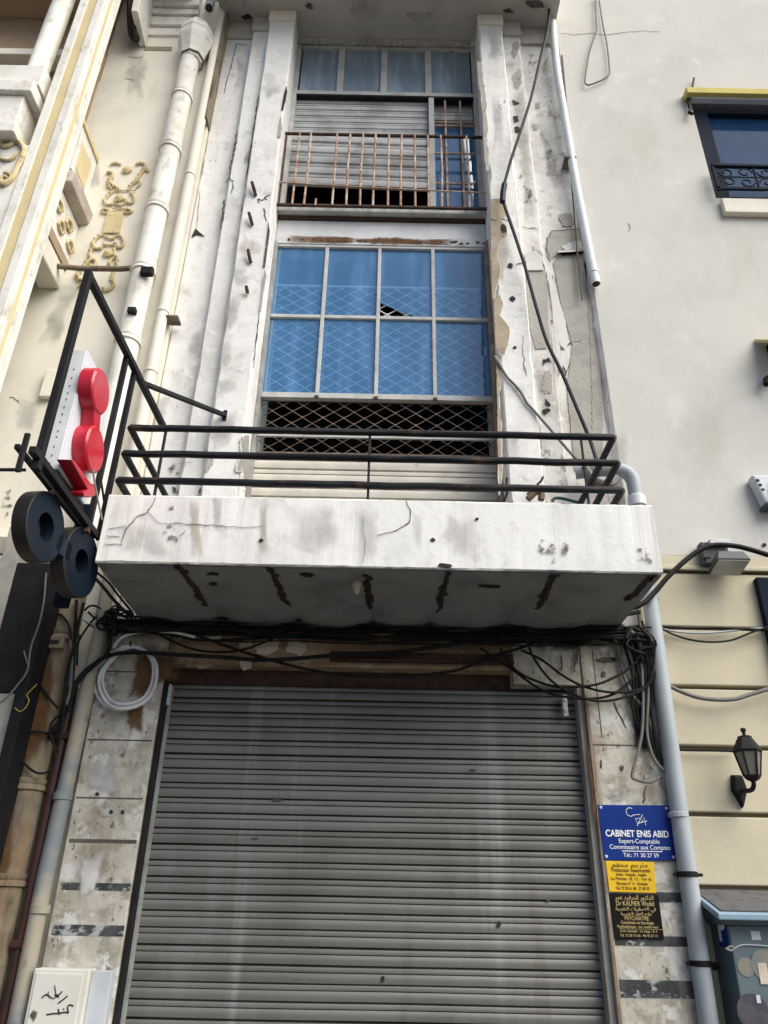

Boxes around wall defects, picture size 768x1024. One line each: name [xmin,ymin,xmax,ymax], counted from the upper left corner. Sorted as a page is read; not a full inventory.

spalling [477,61,489,172]
peeling [512,42,538,133]
crack [191,96,270,238]
rust [293,236,449,245]
spalling [490,198,603,495]
crack [106,495,259,545]
crack [363,500,411,561]